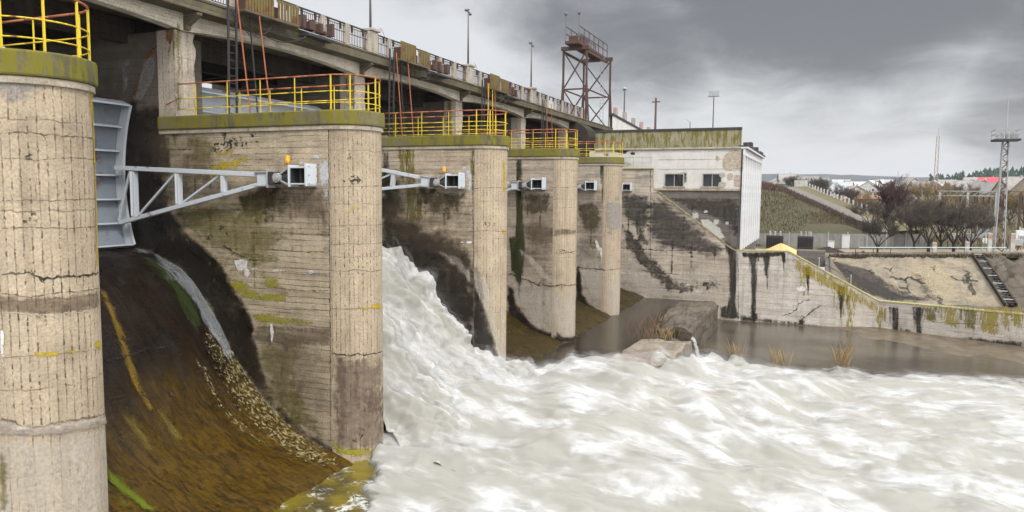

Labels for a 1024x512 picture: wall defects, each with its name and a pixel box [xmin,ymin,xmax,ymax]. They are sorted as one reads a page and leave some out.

crack [2,270,99,322]
leakage [95,57,383,466]
leakage [622,194,814,326]
leakage [832,259,962,333]
leakage [966,338,1022,346]